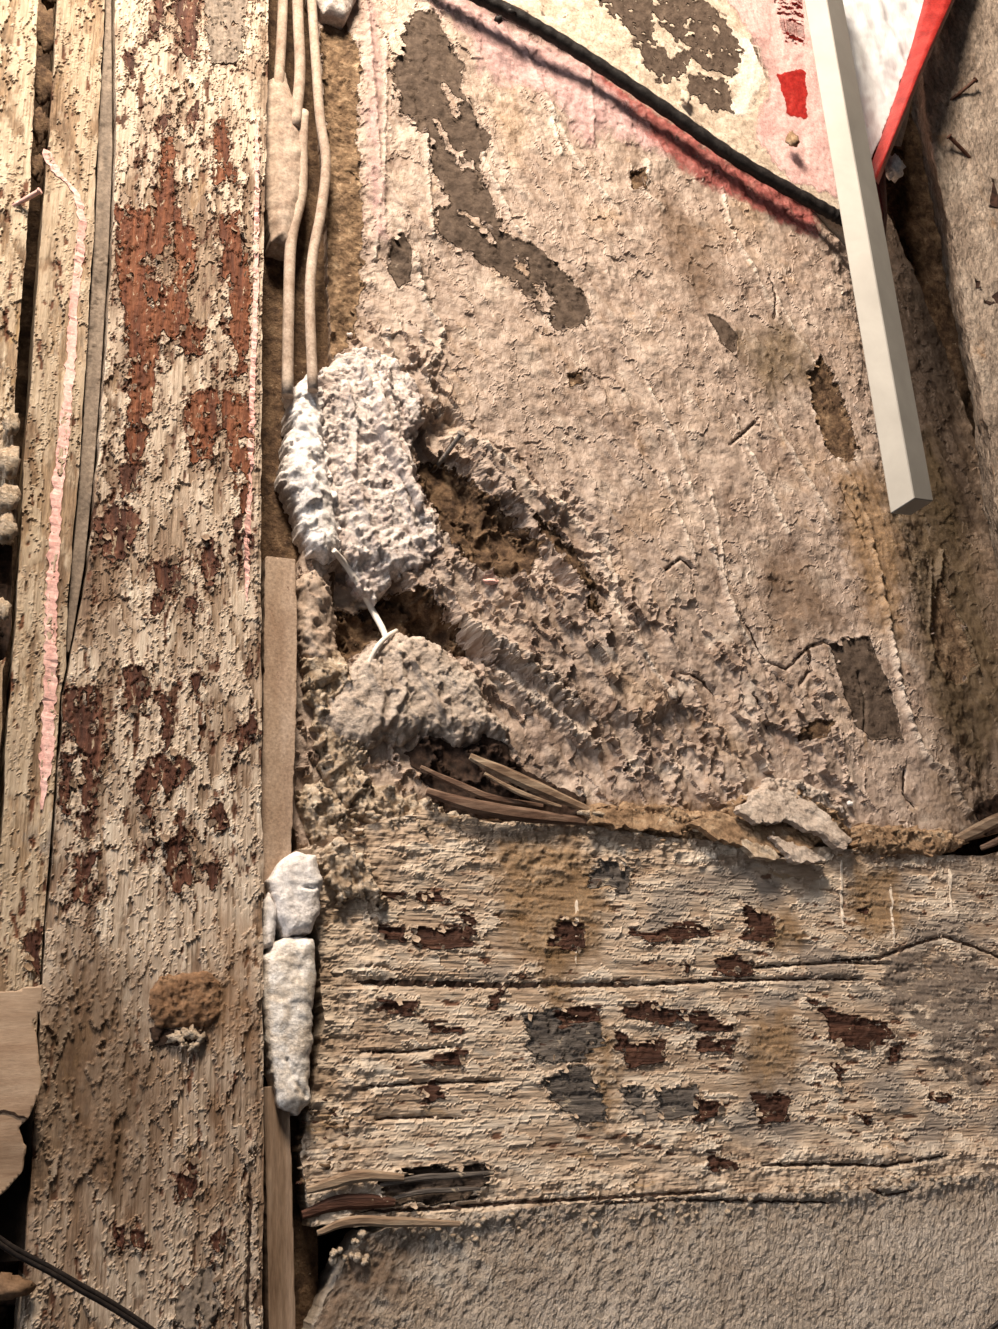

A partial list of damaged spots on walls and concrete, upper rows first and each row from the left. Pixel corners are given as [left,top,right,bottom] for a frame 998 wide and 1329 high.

peeling [147,0,248,64]
damp [469,10,654,147]
peeling [94,100,238,563]
peeling [151,209,256,616]
spalling [829,633,904,740]
peeling [59,665,220,904]
spalling [294,734,969,955]
crack [356,935,998,989]
peeling [375,994,469,1103]
crack [361,1046,502,1120]
peeling [521,998,738,1128]
peeling [806,993,905,1087]